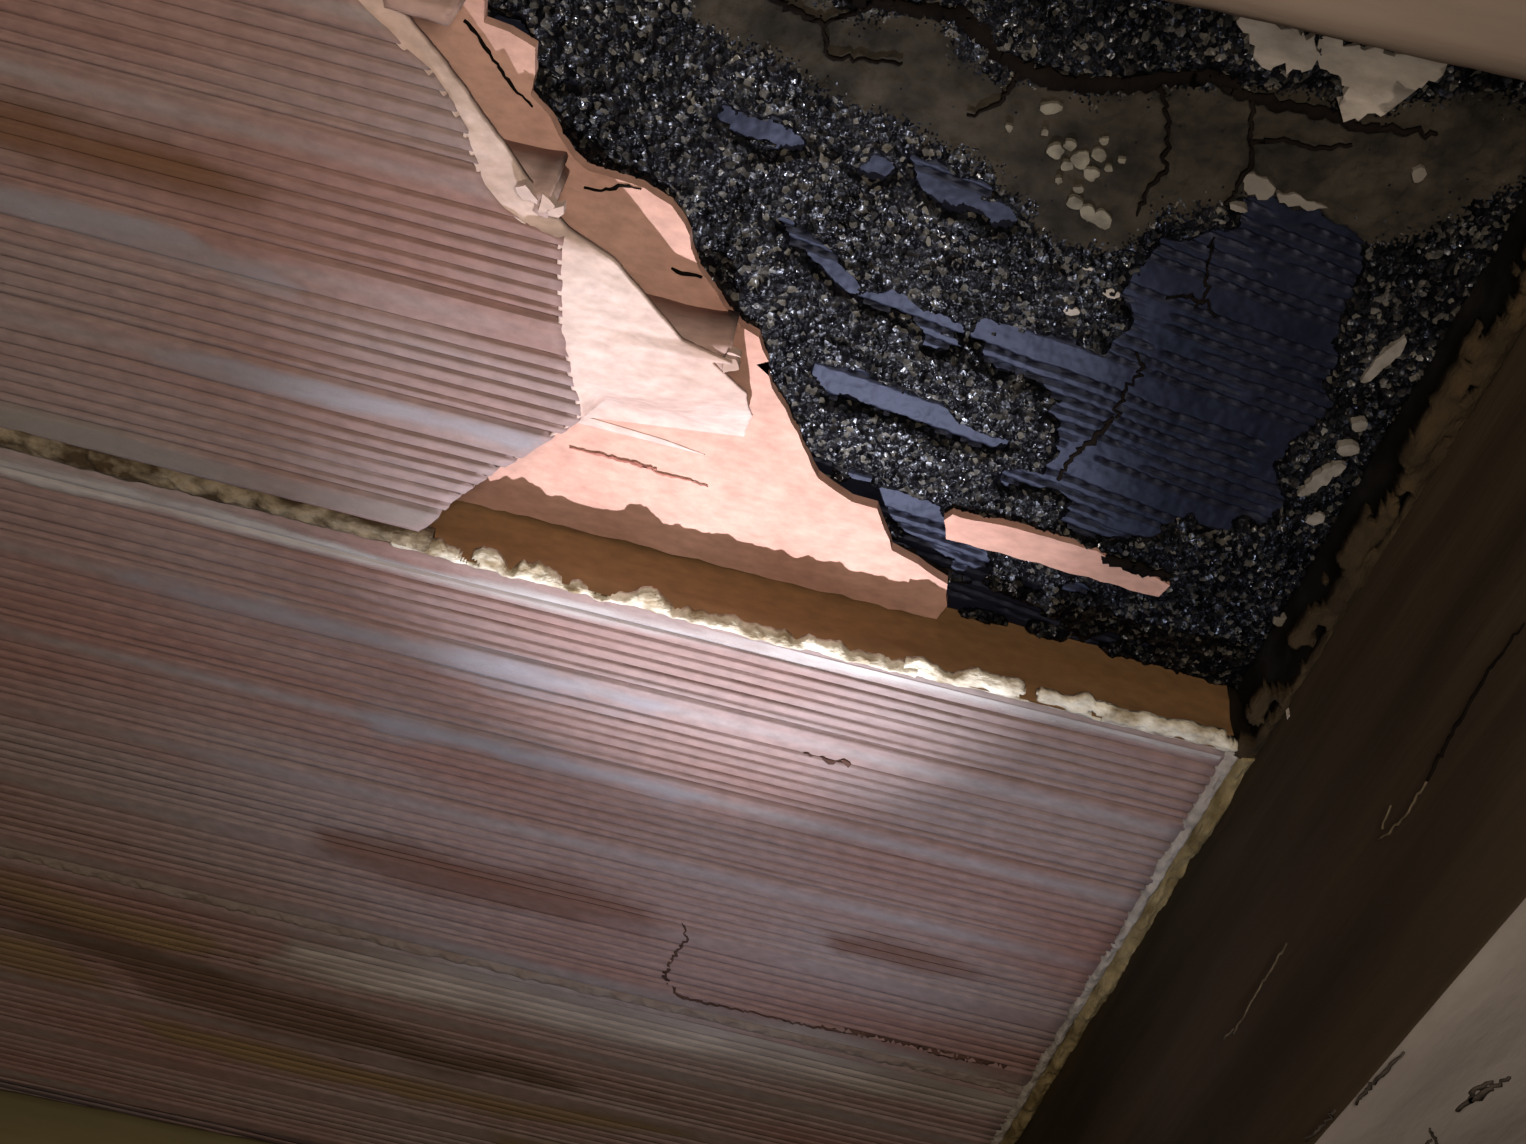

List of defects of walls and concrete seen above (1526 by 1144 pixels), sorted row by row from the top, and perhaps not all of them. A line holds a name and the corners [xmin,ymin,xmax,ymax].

spalling [359,0,753,455]
flaking render [1235,16,1447,122]
spalling [1231,239,1526,759]
crack [661,923,1008,1069]